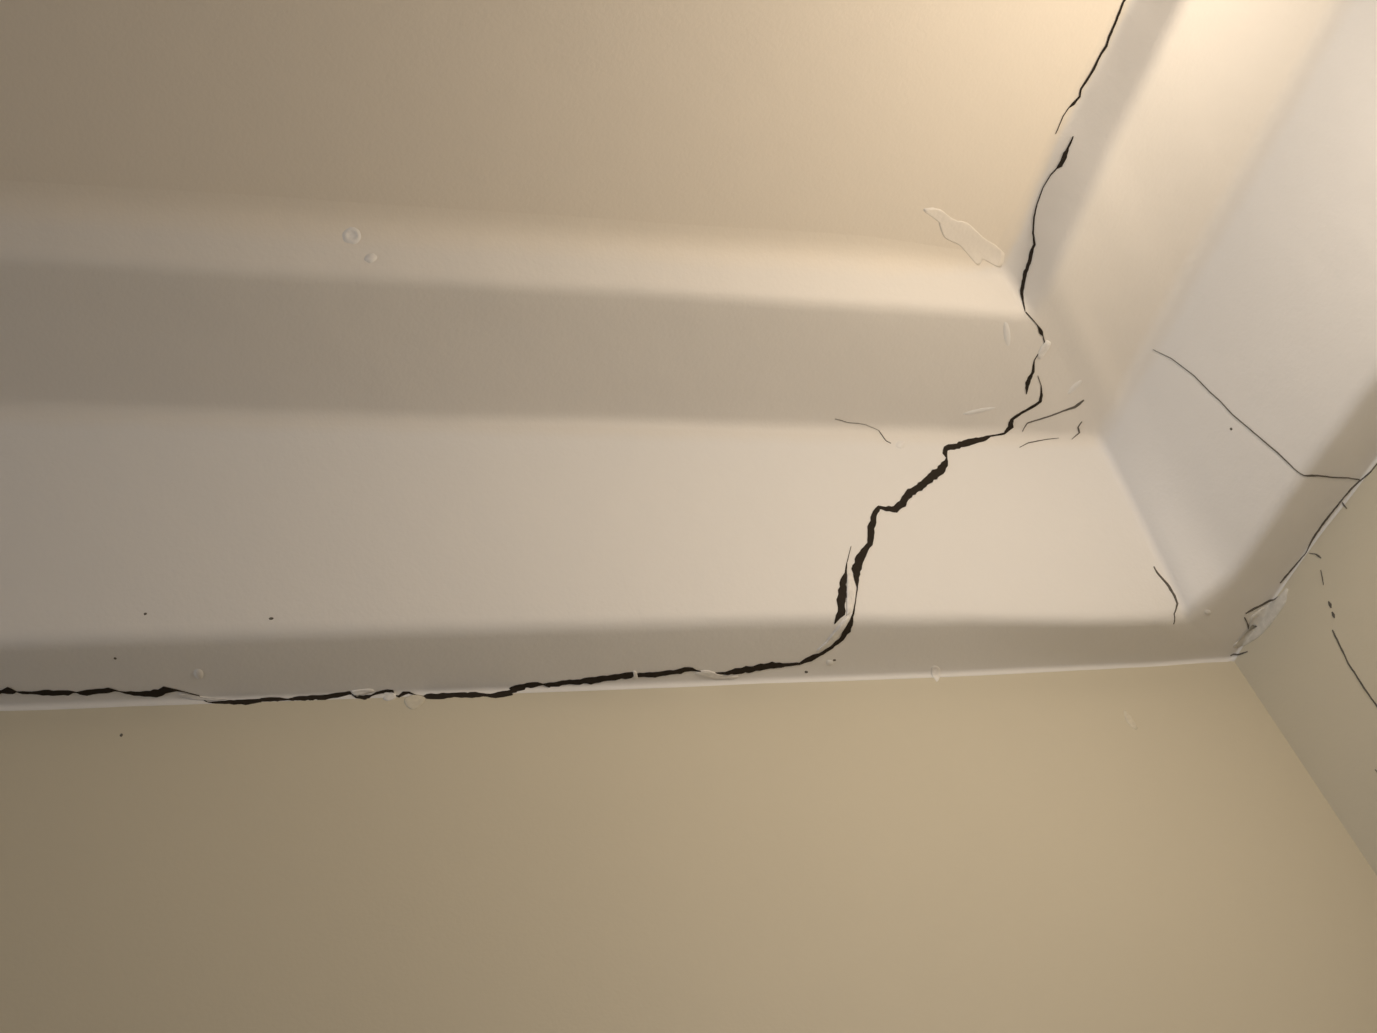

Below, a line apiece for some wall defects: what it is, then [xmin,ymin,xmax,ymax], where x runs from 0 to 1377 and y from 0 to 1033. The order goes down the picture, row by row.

crack [0,0,1126,710]
crack [1154,350,1377,707]